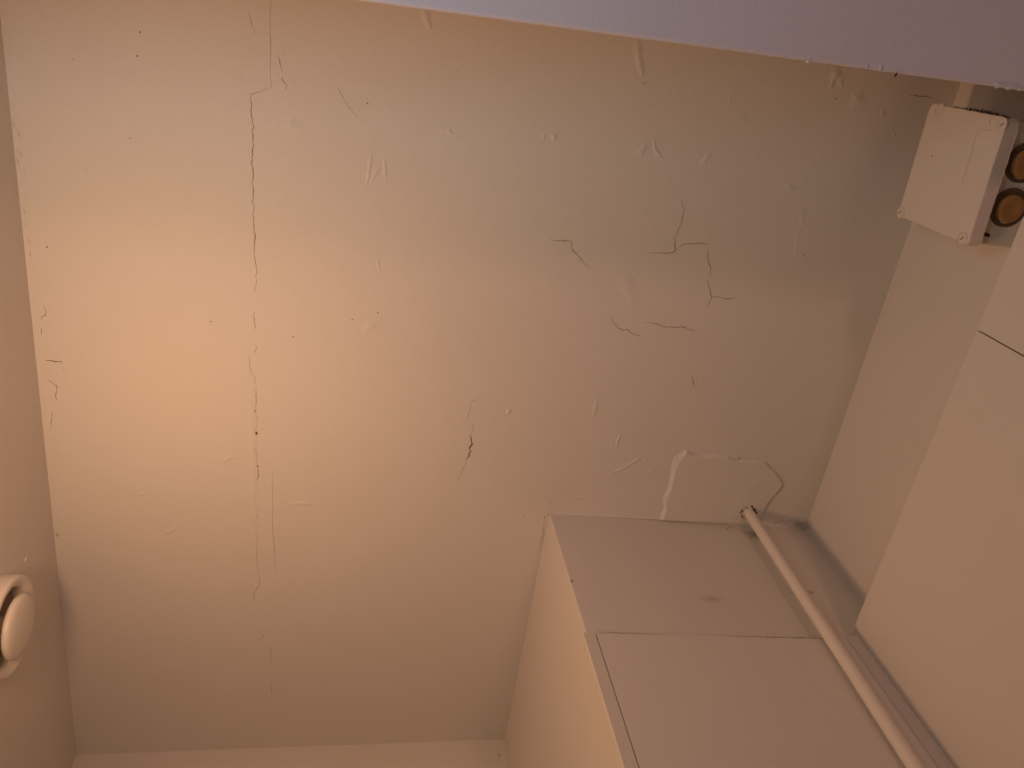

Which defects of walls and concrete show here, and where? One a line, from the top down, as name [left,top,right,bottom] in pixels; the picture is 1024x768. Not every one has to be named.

crack [249,6,287,284]
crack [652,207,733,306]
crack [457,398,479,481]